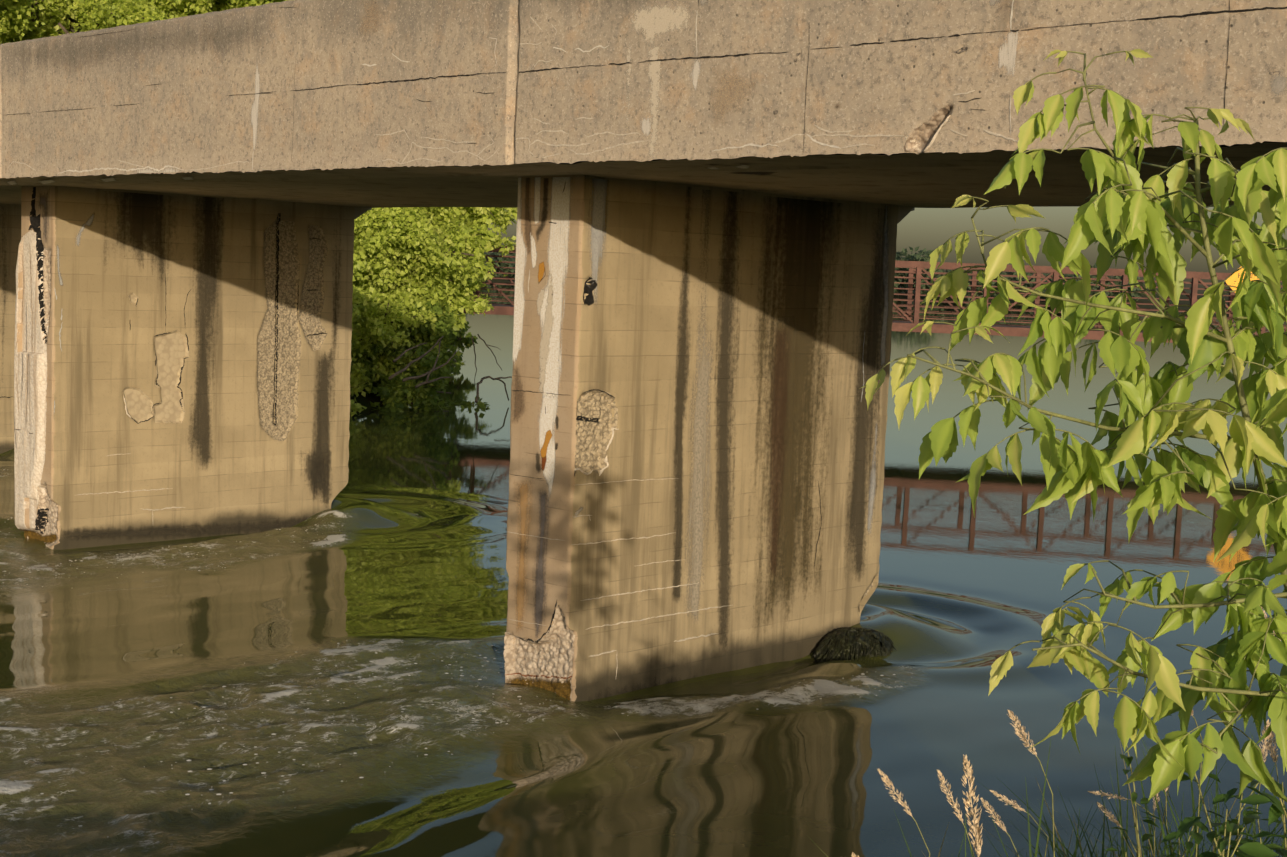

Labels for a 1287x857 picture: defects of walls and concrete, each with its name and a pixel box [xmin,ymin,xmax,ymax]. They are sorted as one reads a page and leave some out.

crack [227,0,1287,164]
spalling [904,103,953,152]
crack [10,160,251,344]
water stain [192,197,223,465]
spalling [257,213,328,441]
water stain [306,256,340,503]
corrosion [536,417,558,472]
spalling [574,389,673,485]
water stain [673,187,737,644]
water stain [757,197,840,613]
water stain [847,206,888,575]
spalling [503,601,731,701]